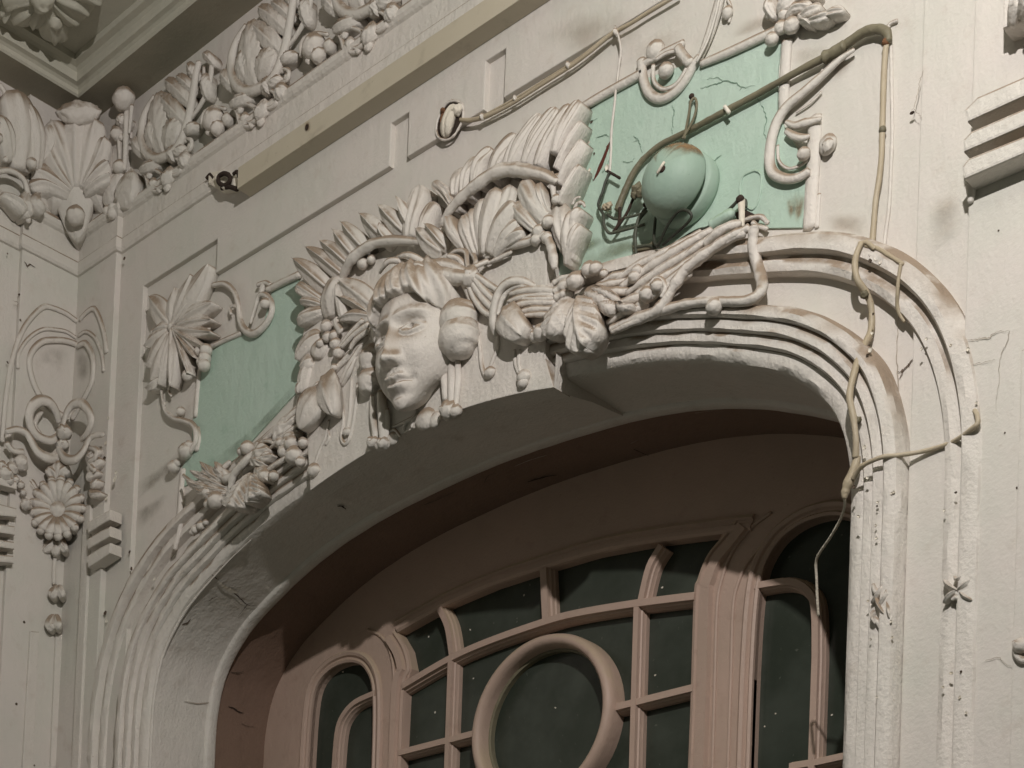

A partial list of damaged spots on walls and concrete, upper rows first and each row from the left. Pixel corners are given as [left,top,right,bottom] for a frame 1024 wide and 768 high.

crack [705,77,767,138]
crack [971,330,1010,398]